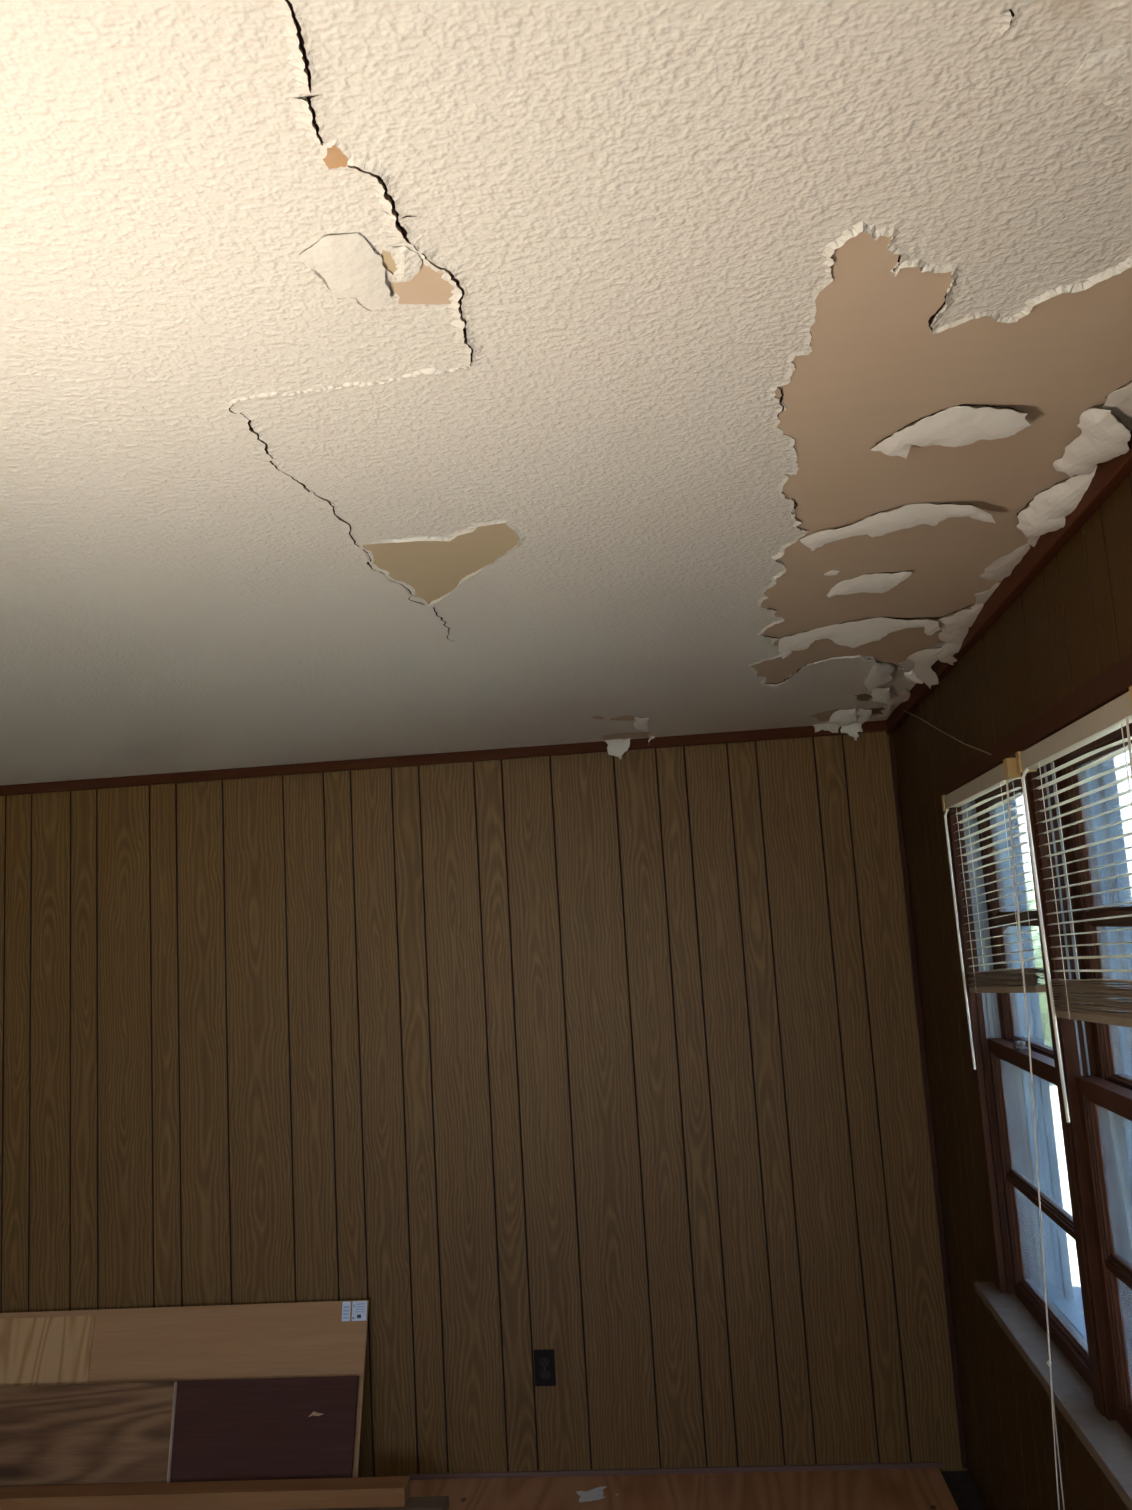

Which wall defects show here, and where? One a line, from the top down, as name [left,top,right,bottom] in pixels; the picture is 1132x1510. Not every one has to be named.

spalling [316,138,352,171]
peeling [296,232,454,311]
crack [218,0,483,642]
peeling [748,221,1132,741]
peeling [356,520,527,607]
peeling [592,715,655,760]